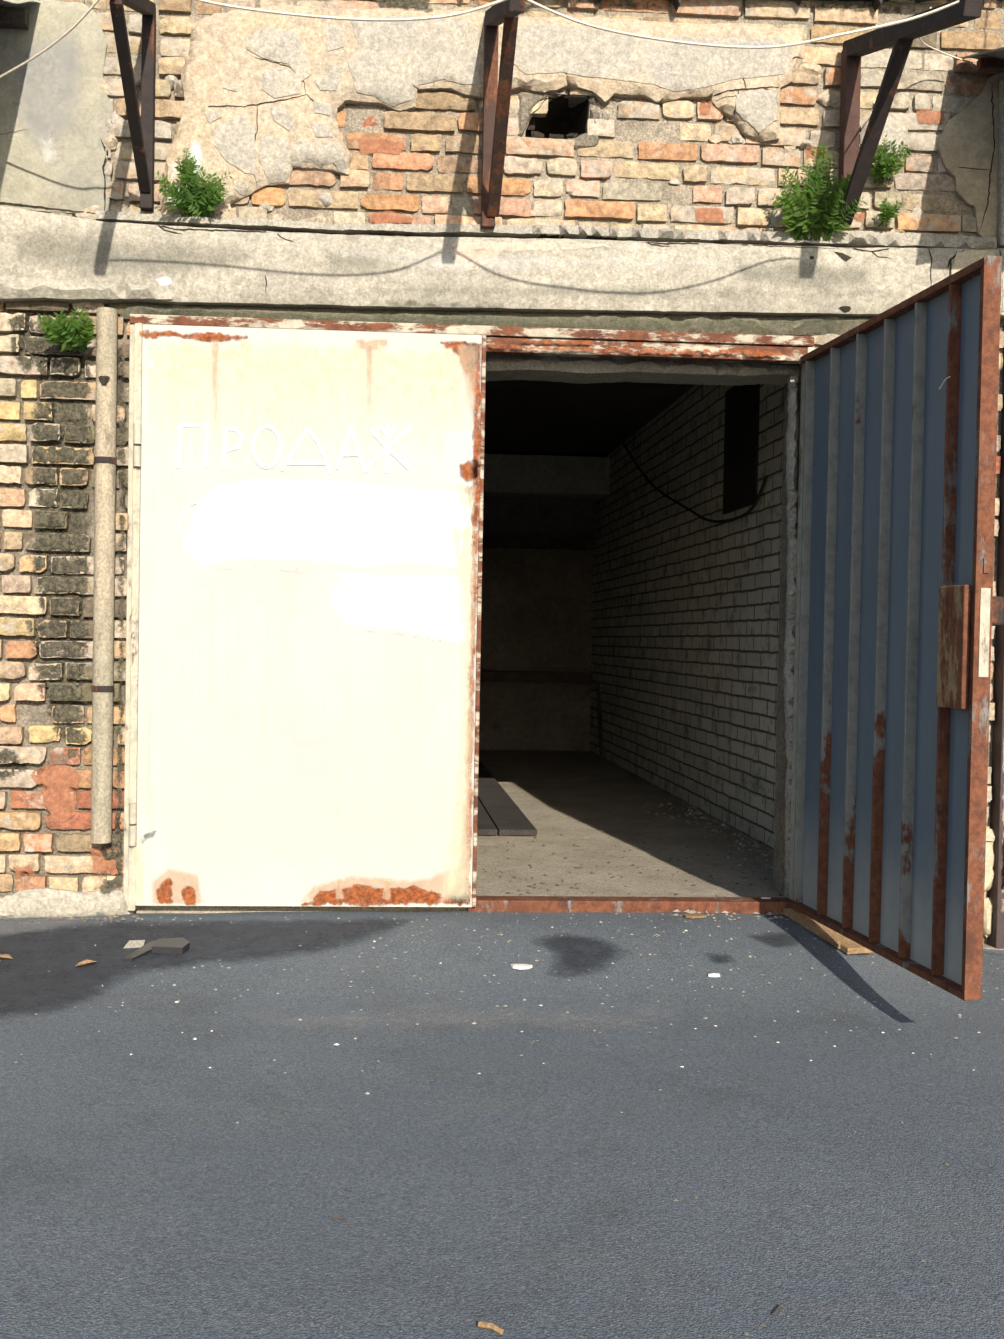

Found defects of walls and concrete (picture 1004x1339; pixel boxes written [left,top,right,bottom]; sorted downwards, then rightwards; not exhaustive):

flaking render [41,12,195,220]
crack [208,56,314,141]
flaking render [204,15,1001,261]
peeling [451,241,608,270]
peeling [951,244,1004,311]
corrosion [301,339,793,907]